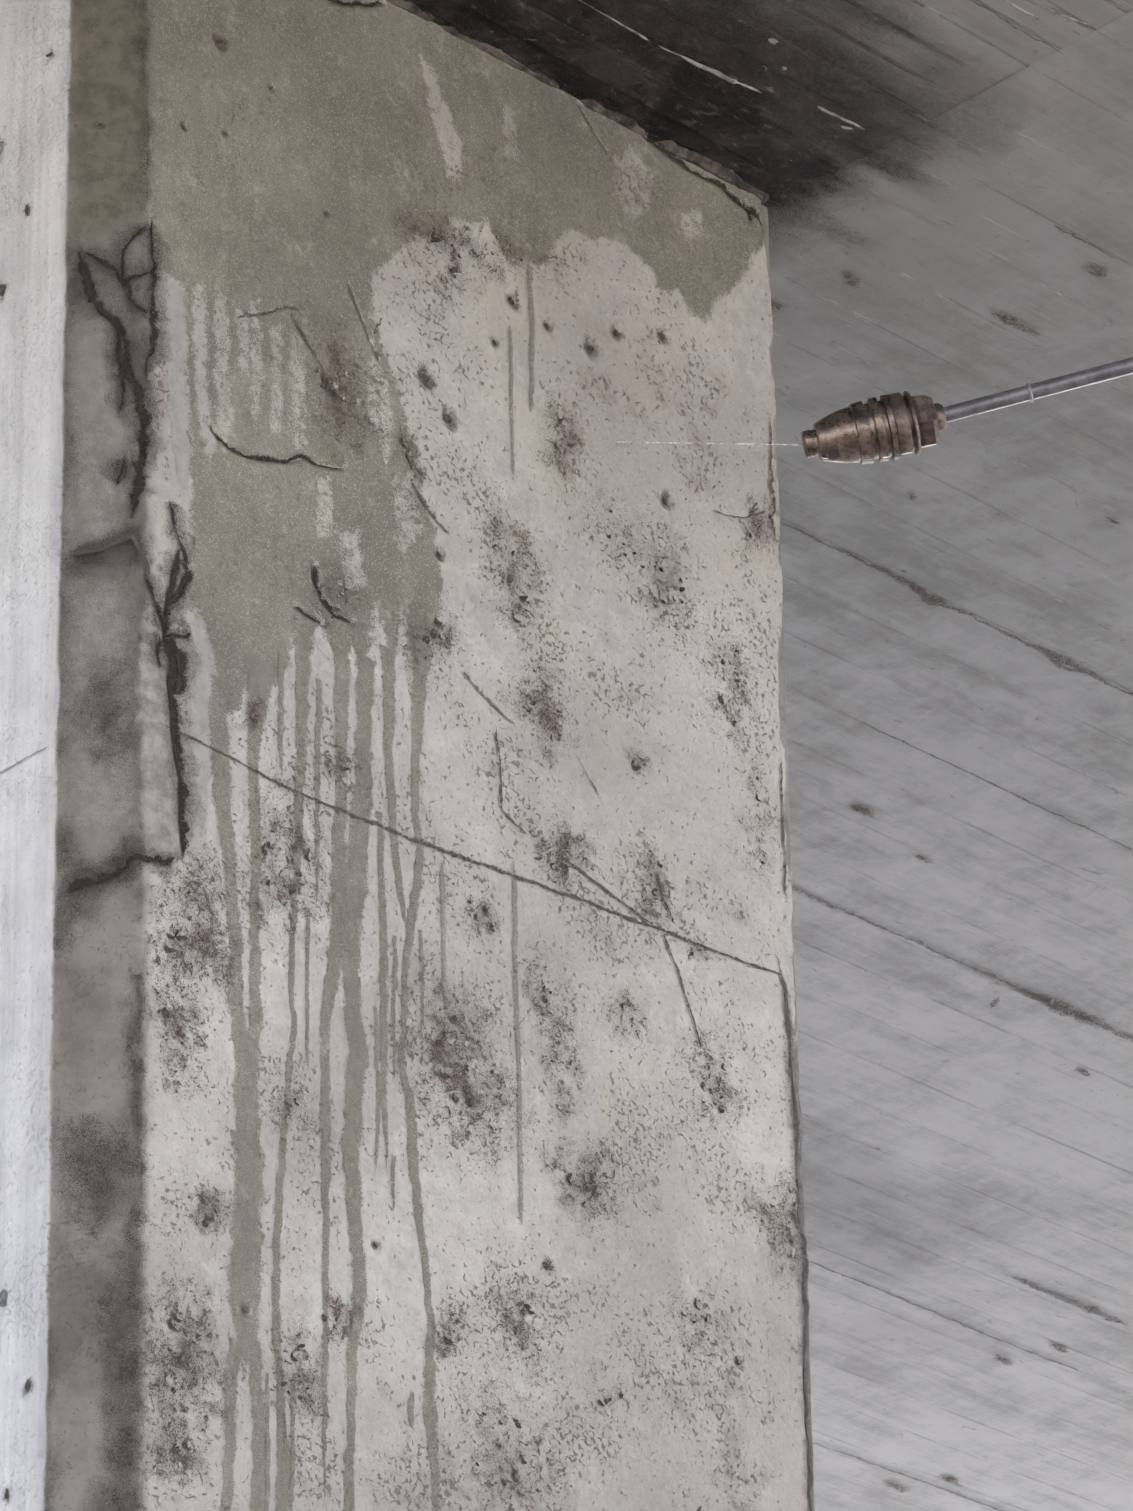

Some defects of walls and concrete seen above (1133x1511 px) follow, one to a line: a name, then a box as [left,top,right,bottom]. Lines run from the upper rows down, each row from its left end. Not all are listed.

crack [0,746,48,773]
water stain [66,0,970,1511]
crack [838,710,1133,851]
crack [64,217,1088,1511]
crack [1004,1274,1126,1325]